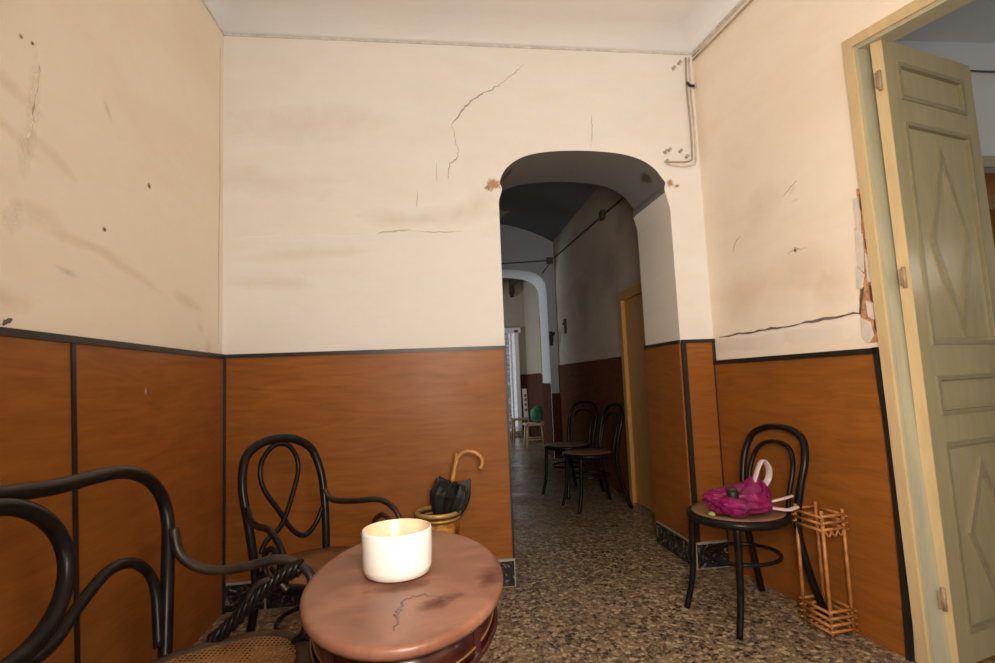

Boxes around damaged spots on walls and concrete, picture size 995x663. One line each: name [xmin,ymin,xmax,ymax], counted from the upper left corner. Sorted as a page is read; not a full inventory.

crack [416,64,524,206]
crack [378,227,454,235]
crack [719,312,859,338]
peeling [853,189,878,343]